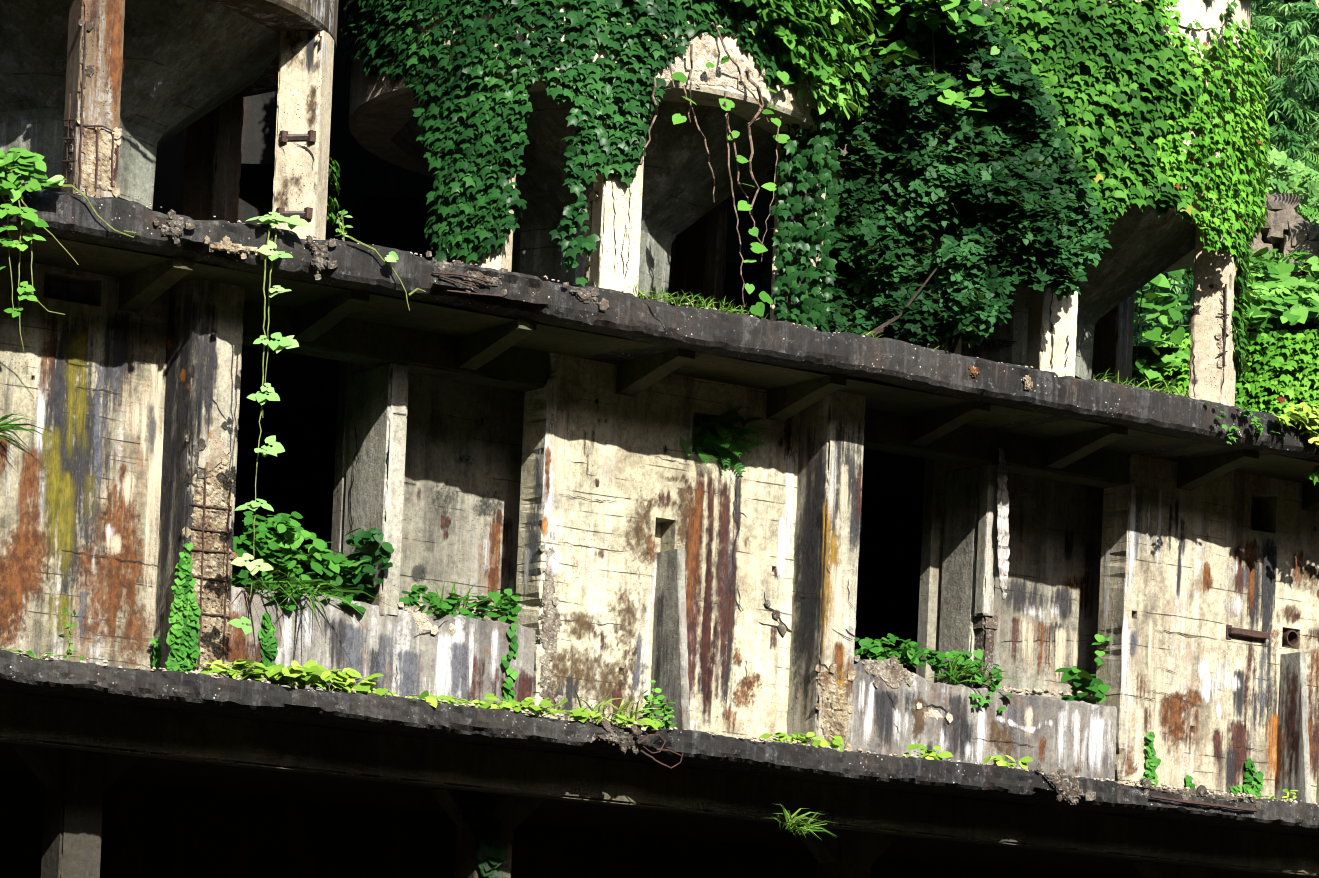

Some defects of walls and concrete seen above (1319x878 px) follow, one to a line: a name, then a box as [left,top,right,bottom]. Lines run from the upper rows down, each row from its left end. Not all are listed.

spalling [62,19,122,198]
spalling [153,209,270,260]
spalling [306,235,338,281]
corrosion [0,448,51,649]
corrosion [80,464,154,664]
leakage [32,293,218,635]
spalling [182,434,238,669]
corrosion [626,470,762,731]
leakage [777,414,862,709]
leakage [858,682,918,745]
corrosion [1137,605,1319,791]
corrosion [1228,542,1256,615]